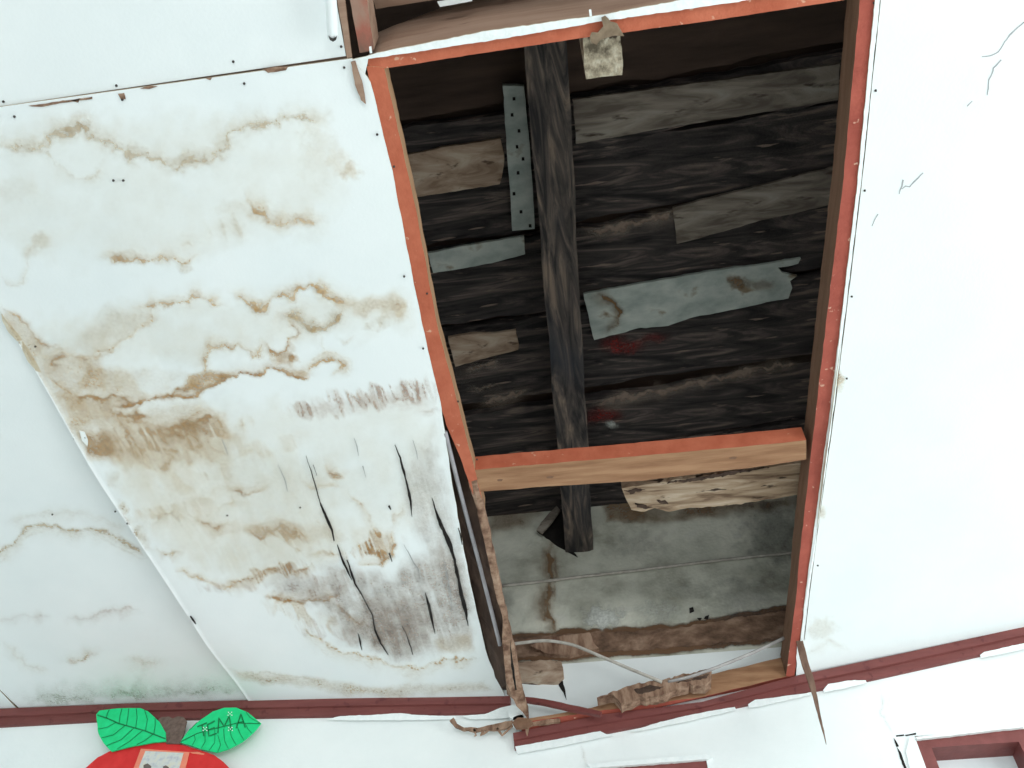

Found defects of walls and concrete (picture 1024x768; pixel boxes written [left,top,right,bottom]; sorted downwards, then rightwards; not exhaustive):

crack [967,22,1024,107]
leakage [77,284,346,470]
leakage [334,381,423,413]
peeling [599,361,797,406]
spalling [667,467,769,484]
crack [306,456,413,655]
leakage [359,531,396,565]
crack [388,441,468,633]
flaking render [536,506,577,557]
leakage [229,561,468,660]
flaking render [512,605,786,685]
peeling [796,639,807,676]